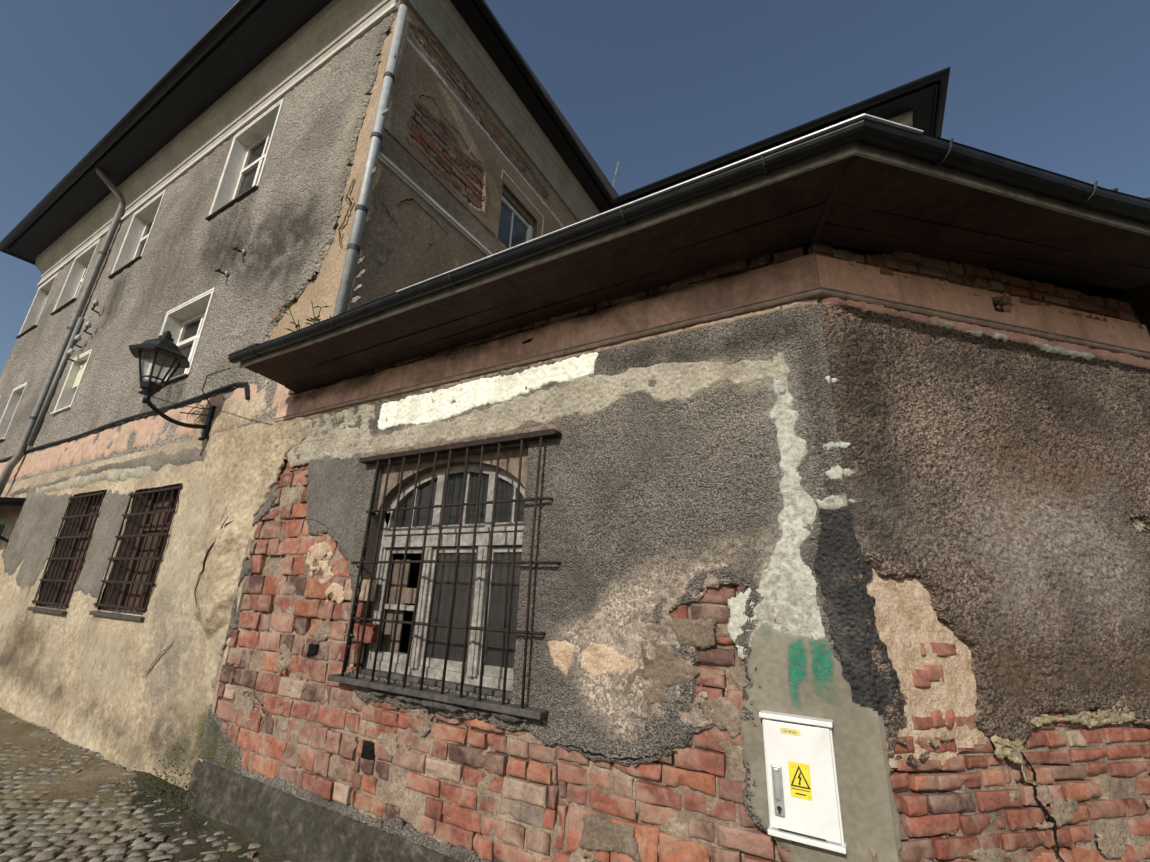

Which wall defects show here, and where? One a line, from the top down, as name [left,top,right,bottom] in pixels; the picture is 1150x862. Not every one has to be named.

flaking render [406,104,488,209]
flaking render [0,243,1143,480]
flaking render [211,454,791,862]
flaking render [853,553,1150,862]
crack [1020,752,1065,862]